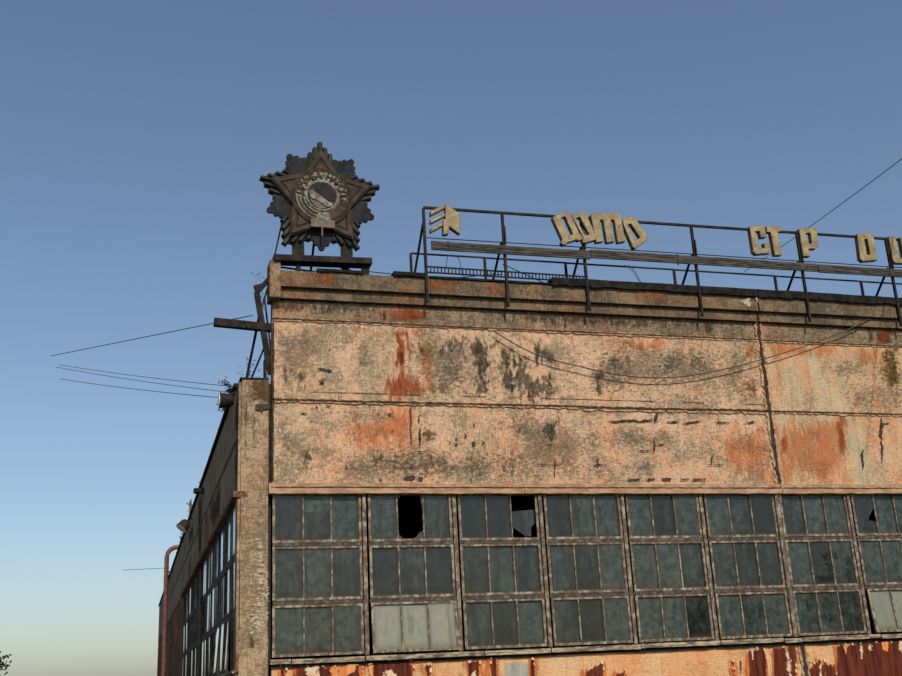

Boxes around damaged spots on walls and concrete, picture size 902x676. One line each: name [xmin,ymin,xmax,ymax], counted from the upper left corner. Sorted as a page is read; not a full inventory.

peeling [278,659,433,676]
peeling [463,658,501,676]
peeling [528,657,539,676]